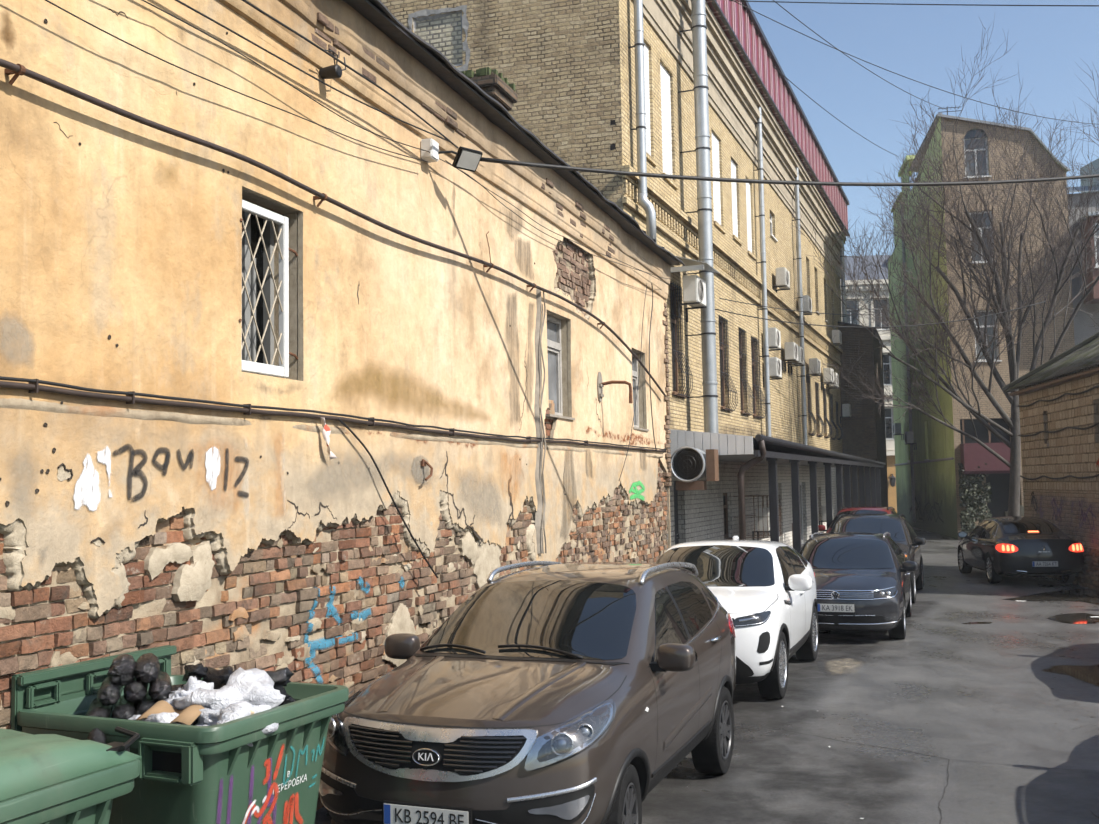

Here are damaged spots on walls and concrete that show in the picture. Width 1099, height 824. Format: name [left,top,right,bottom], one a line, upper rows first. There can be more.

flaking render [541,178,594,320]
flaking render [602,224,615,257]
spalling [0,398,252,426]
spalling [292,424,350,434]
damp [345,369,442,405]
spalling [390,400,632,456]
crack [286,500,337,536]
crack [440,451,483,547]
crack [507,476,515,527]
flaking render [556,454,668,564]
flaking render [0,490,537,729]